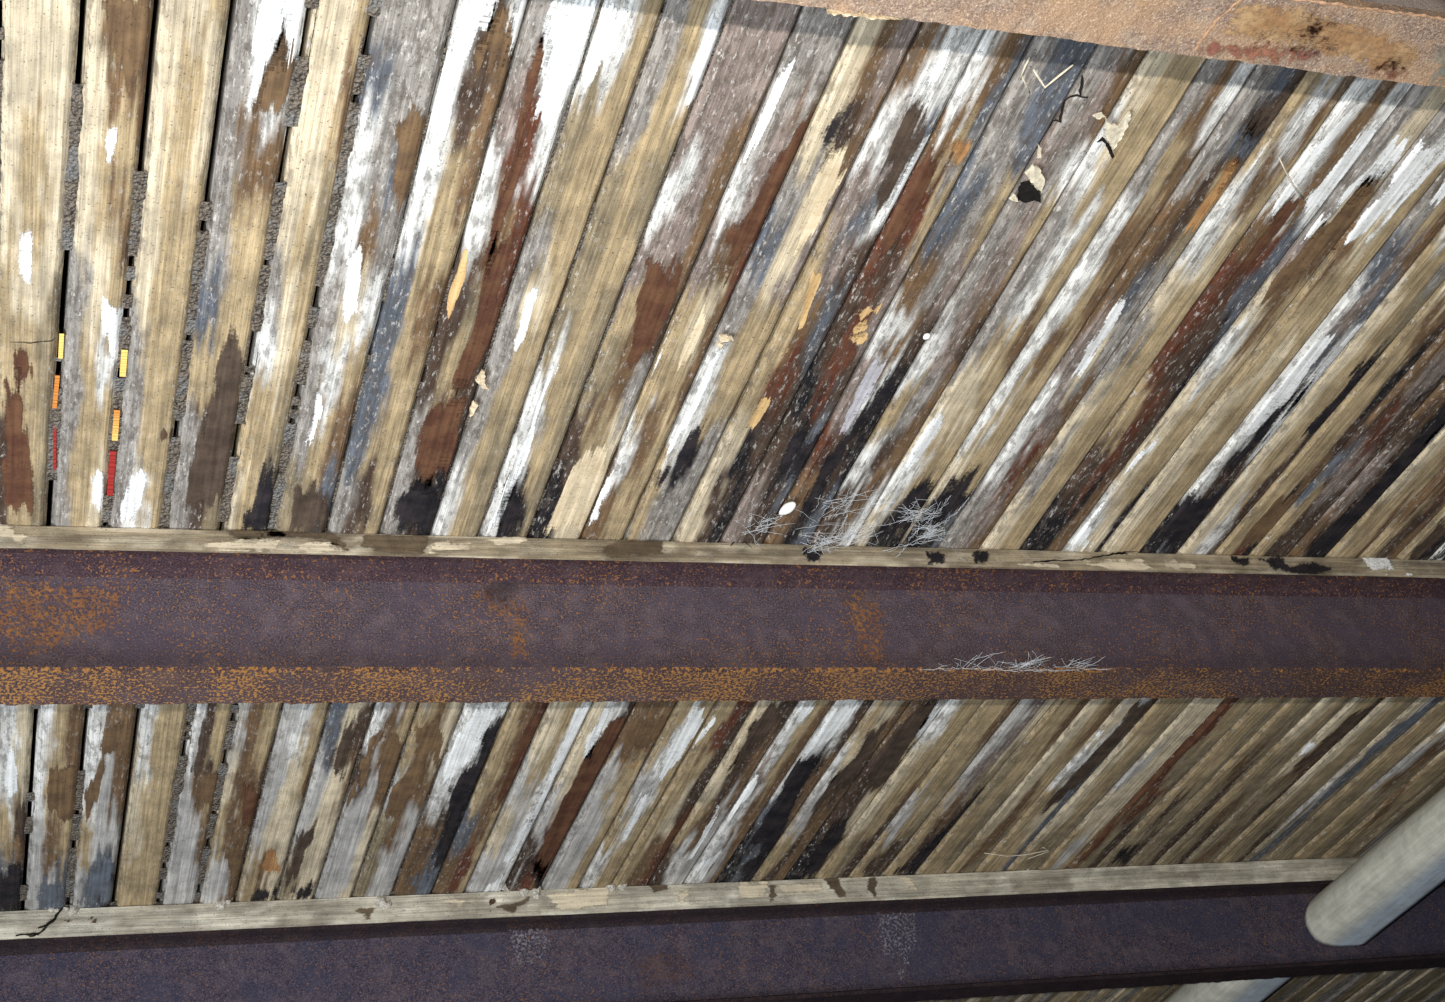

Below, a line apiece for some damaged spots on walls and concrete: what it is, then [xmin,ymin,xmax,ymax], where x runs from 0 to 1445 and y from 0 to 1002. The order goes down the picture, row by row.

rust [1193,0,1445,80]
rust [0,576,134,665]
rust [474,589,535,663]
rust [842,589,890,663]